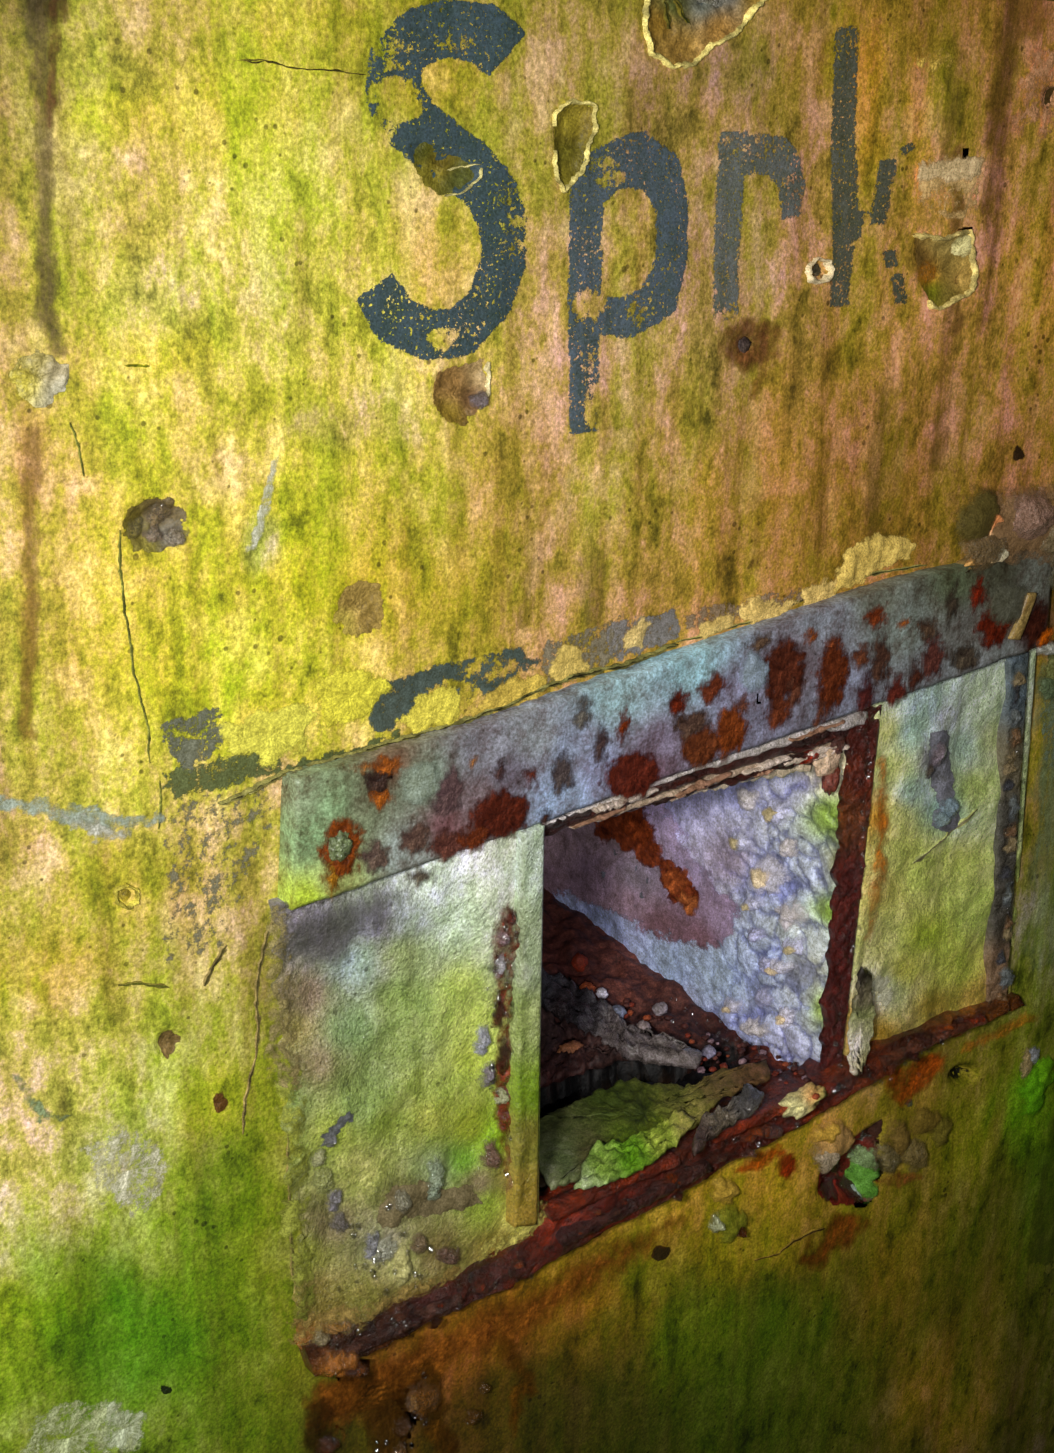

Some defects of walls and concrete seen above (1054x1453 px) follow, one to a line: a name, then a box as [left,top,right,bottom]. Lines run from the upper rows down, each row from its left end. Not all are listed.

spalling [642,0,767,69]
water stain [982,0,1040,217]
water stain [39,150,59,353]
spalling [912,155,986,311]
water stain [21,583,35,729]
corrosion [669,577,1053,768]
corrosion [317,751,574,896]
peeling [160,580,804,963]
corrosion [572,695,699,916]
corrosion [474,905,520,1192]
corrosion [539,1149,714,1247]
spalling [818,1119,883,1206]